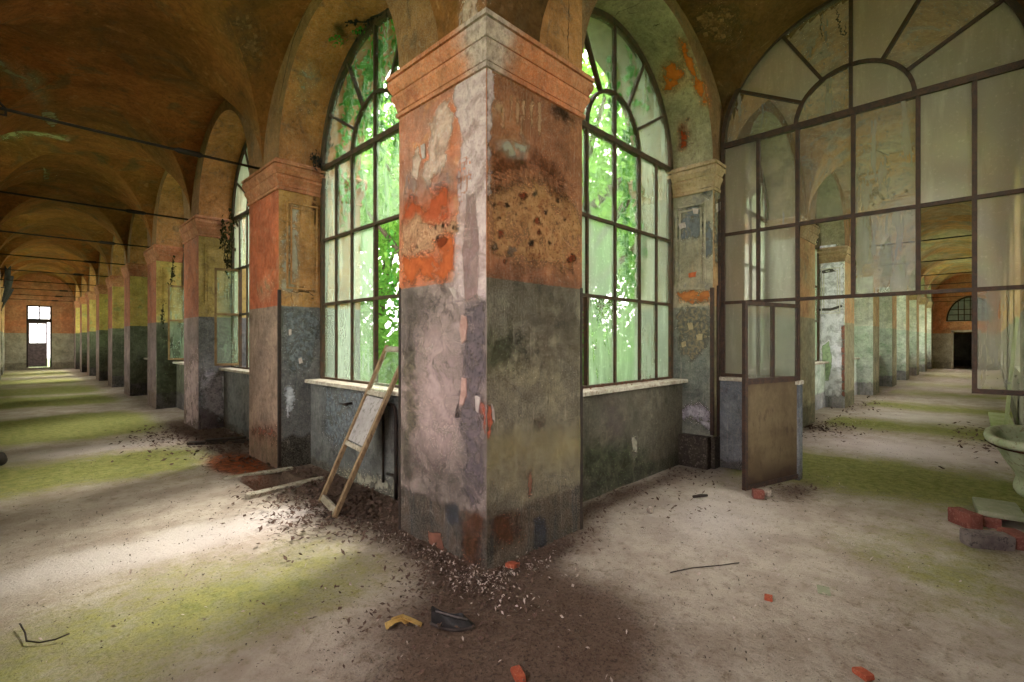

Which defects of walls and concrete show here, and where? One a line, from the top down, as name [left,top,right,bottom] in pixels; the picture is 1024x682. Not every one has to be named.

peeling [677,186,720,263]
flaking render [401,68,582,505]
peeling [676,306,710,362]